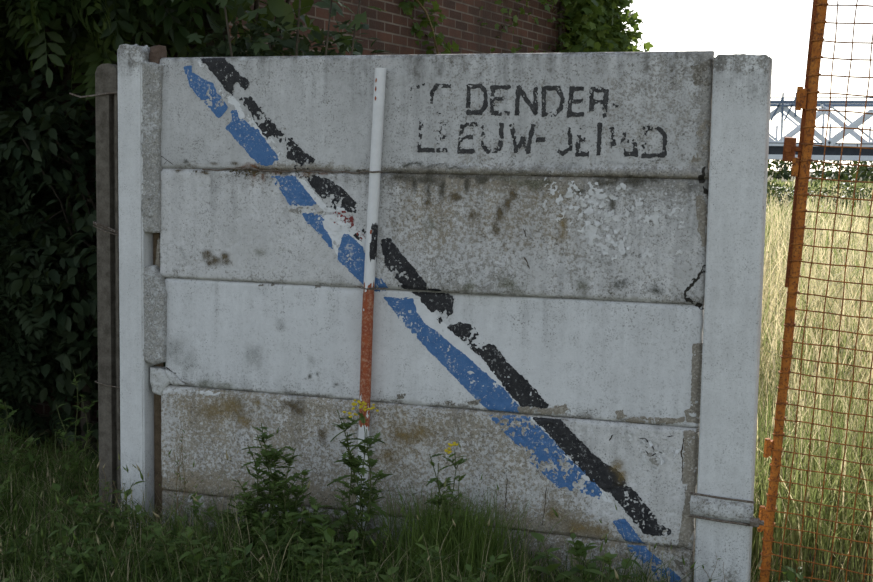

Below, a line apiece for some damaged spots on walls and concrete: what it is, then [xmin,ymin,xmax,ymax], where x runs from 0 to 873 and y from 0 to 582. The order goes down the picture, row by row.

damp [394,162,491,205]
damp [493,190,516,234]
peeling [543,119,711,271]
damp [204,251,229,265]
crack [684,265,706,310]
corrosion [359,294,374,398]
spalling [150,365,220,396]
spalling [615,343,703,576]